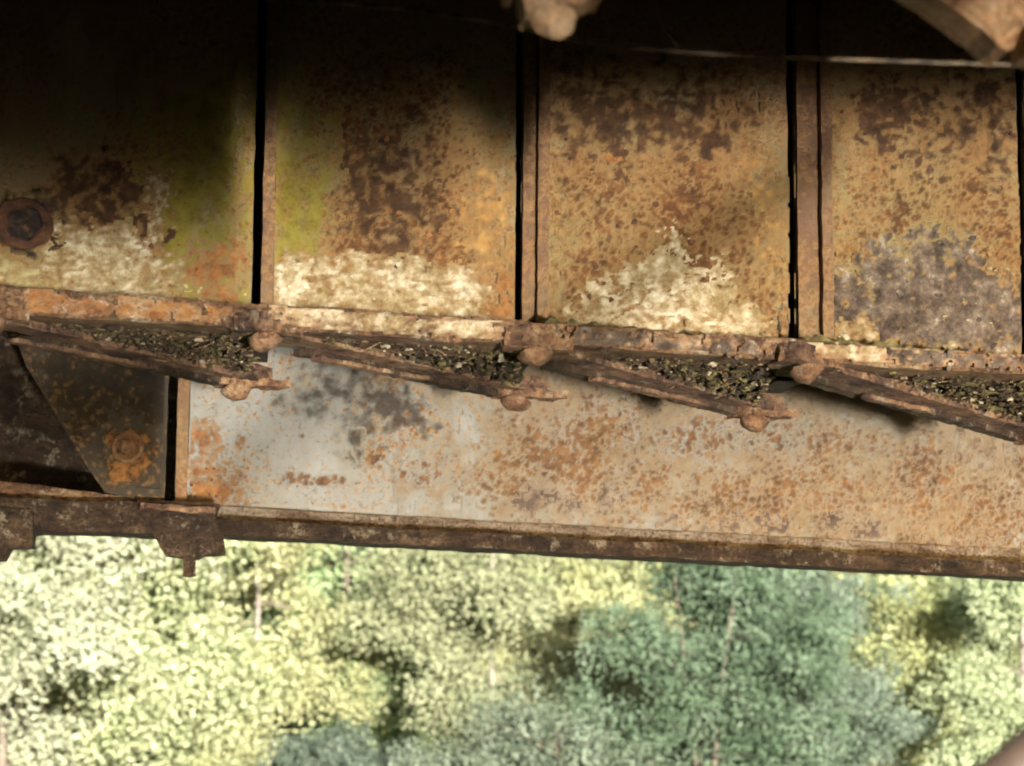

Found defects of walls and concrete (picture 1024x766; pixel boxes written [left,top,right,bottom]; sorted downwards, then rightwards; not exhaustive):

corrosion [7,338,152,370]
leakage [0,167,202,300]
corrosion [35,144,249,303]
leakage [244,246,504,339]
corrosion [309,44,523,320]
corrosion [537,48,798,338]
efflorescence [561,218,778,338]
corrosion [830,33,1024,283]
corrosion [105,428,158,485]
corrosion [189,417,270,508]
corrosion [278,471,361,488]
corrosion [311,356,1024,550]